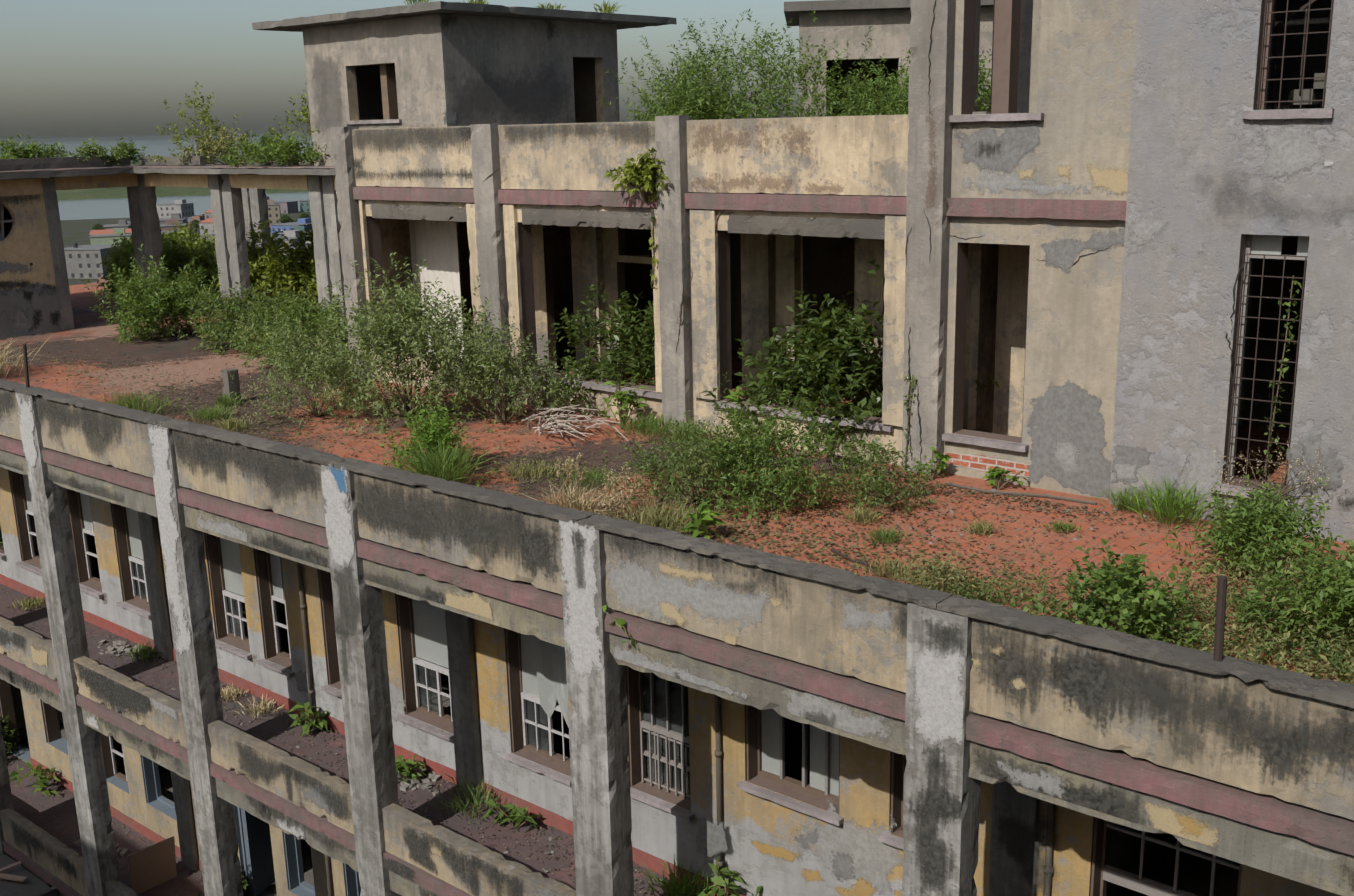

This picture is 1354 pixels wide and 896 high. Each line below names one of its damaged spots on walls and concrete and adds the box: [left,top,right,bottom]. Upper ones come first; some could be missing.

crack [928,0,936,114]
leakage [313,56,651,179]
peeling [954,121,1040,179]
crack [905,213,985,262]
crack [1037,247,1109,268]
peeling [1042,228,1125,273]
leakage [35,396,122,455]
leakage [353,474,586,587]
leakage [925,619,1354,783]
leakage [909,747,960,894]
leakage [1000,819,1050,891]
leakage [973,748,1145,825]